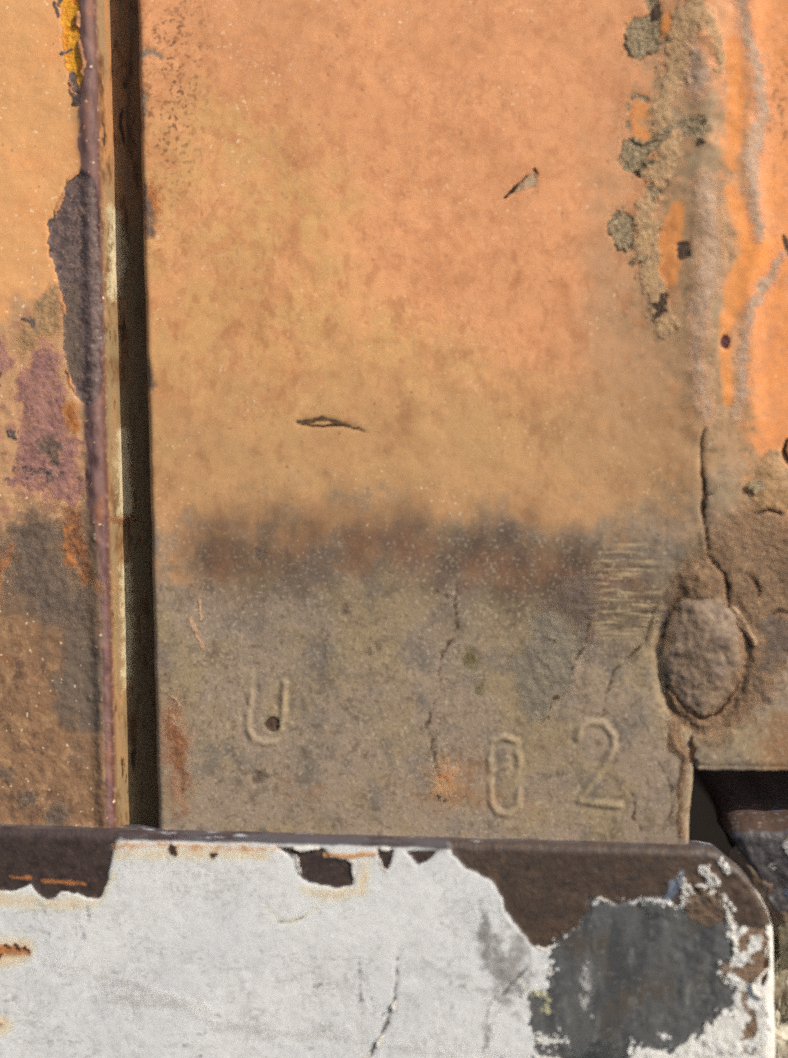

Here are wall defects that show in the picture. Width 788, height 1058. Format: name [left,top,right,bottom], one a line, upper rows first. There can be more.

peeling [607,0,725,339]
peeling [17,171,128,432]
corrosion [0,336,104,591]
crack [700,429,788,615]
crack [437,583,460,675]
crack [427,702,440,776]
peeling [0,826,118,906]
peeling [277,846,394,894]
peeling [407,851,436,864]
corrosion [0,942,31,963]
peeling [449,839,772,1058]
crack [362,958,399,1058]